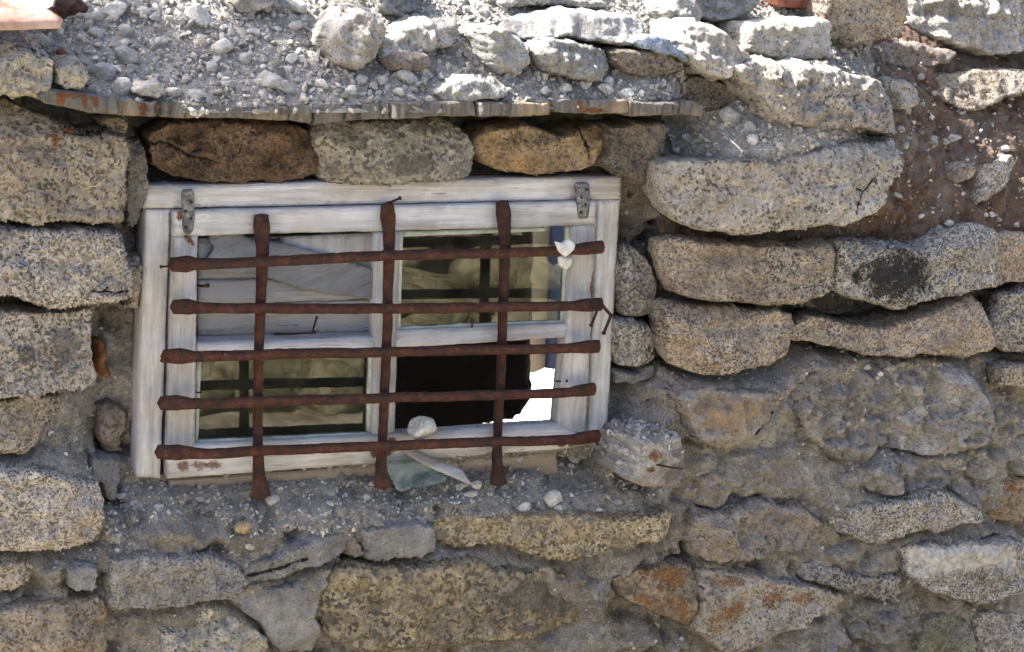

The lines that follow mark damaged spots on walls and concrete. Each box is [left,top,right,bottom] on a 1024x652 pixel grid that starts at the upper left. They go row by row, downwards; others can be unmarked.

corrosion [56,92,98,109]
crack [856,178,874,215]
corrosion [177,461,222,470]